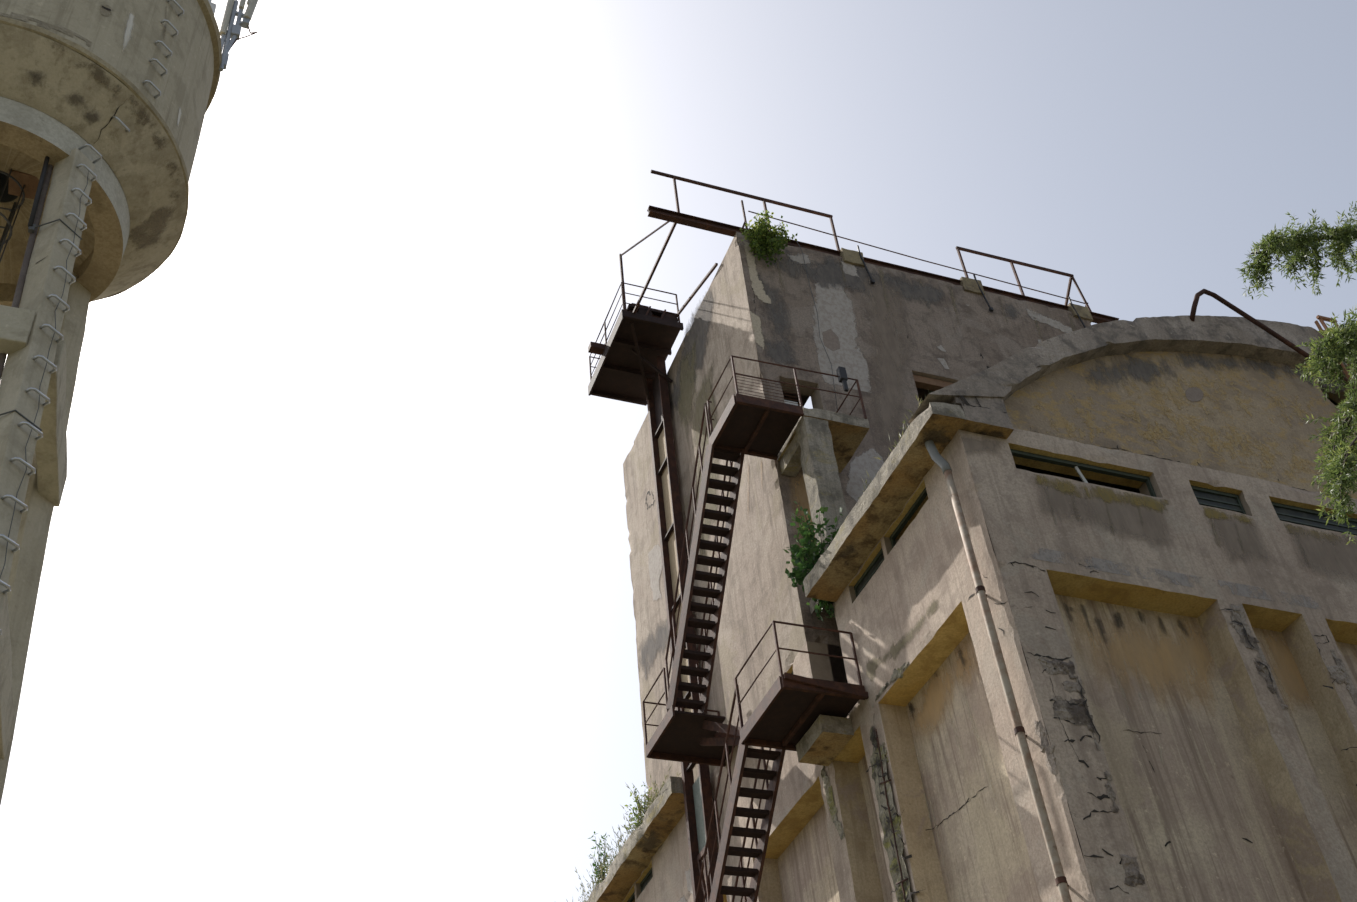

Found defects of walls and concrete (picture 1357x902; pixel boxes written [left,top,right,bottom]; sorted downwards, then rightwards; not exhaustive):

leakage [132,208,172,249]
flaking render [812,261,871,393]
spalling [1221,604,1288,710]
spalling [1034,656,1101,776]
spalling [1119,854,1145,887]